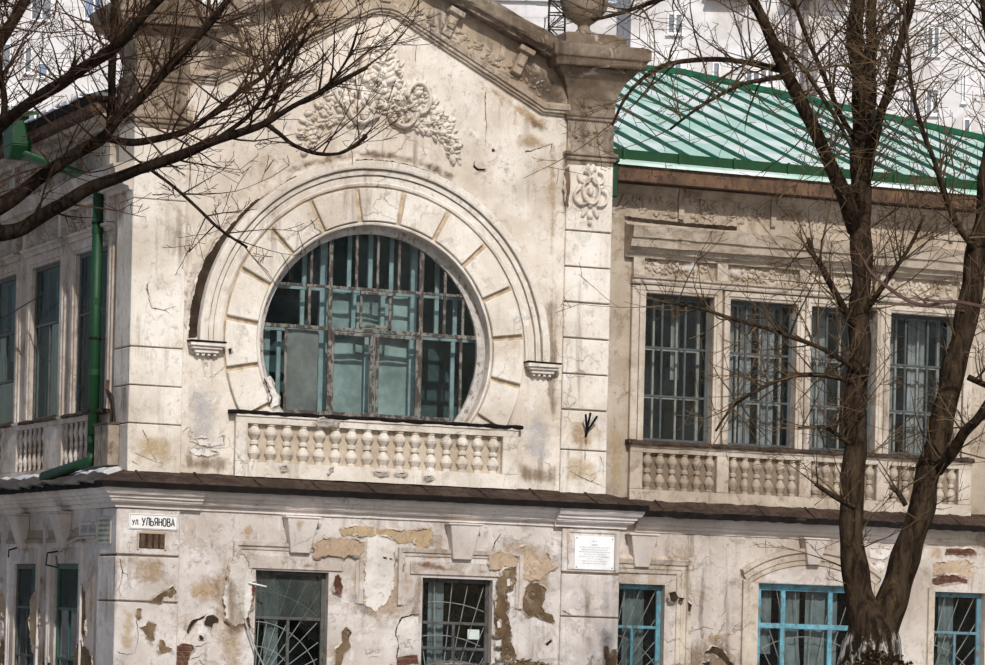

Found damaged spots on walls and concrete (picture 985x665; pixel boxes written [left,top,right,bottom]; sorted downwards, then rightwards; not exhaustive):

peeling [188,433,225,457]
peeling [312,524,443,612]
peeling [932,546,978,587]
peeling [28,591,41,654]
peeling [73,581,94,665]
peeling [134,552,257,665]
crack [395,612,419,658]
peeling [487,544,558,663]
peeling [703,645,734,665]